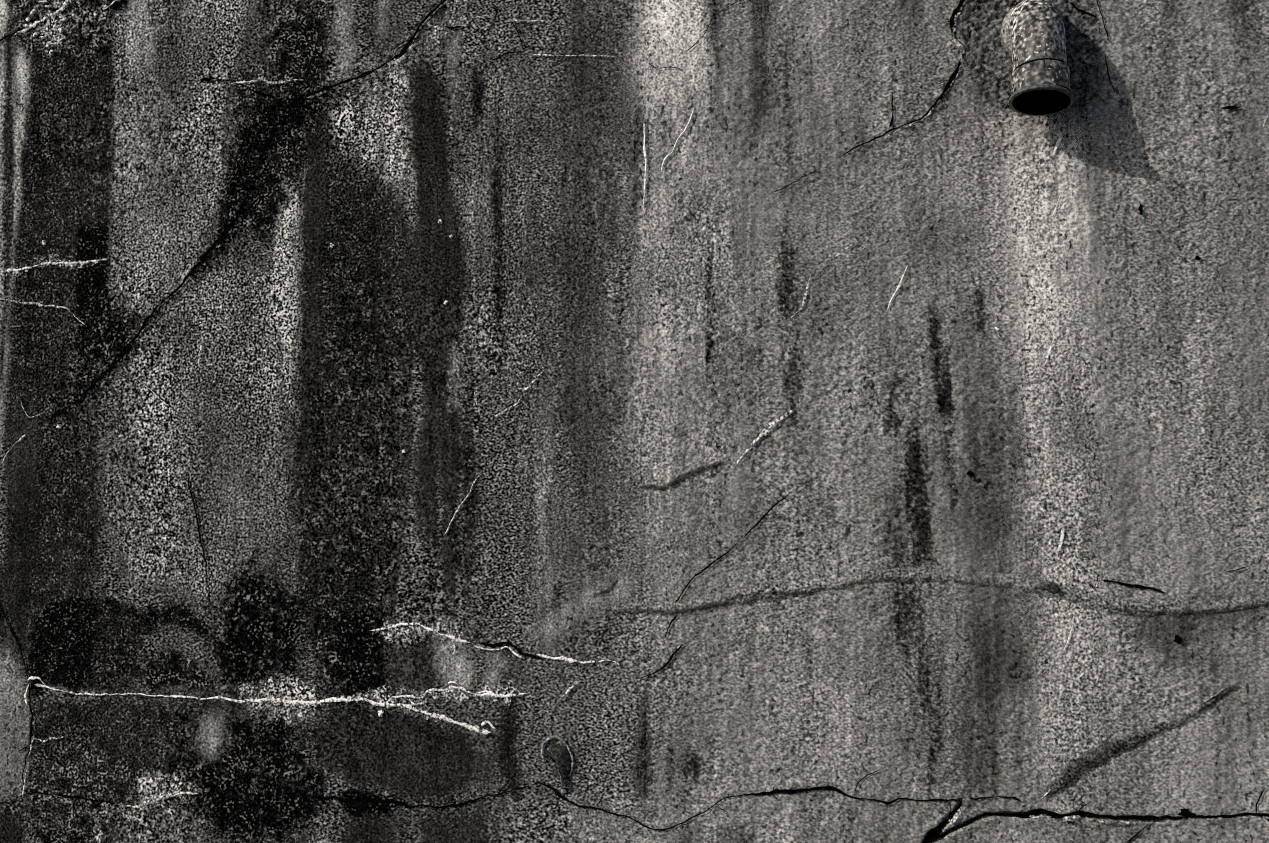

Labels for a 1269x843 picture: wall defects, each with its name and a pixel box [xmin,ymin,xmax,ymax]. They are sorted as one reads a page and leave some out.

damp [750,0,795,177]
crack [774,0,968,192]
crack [1067,0,1115,91]
crack [49,0,462,420]
damp [0,0,752,843]
crack [479,642,544,660]
crack [637,491,792,679]
damp [883,305,961,792]
damp [961,128,1112,838]
crack [1102,580,1166,593]
crack [315,769,1269,843]
damp [994,824,1053,843]